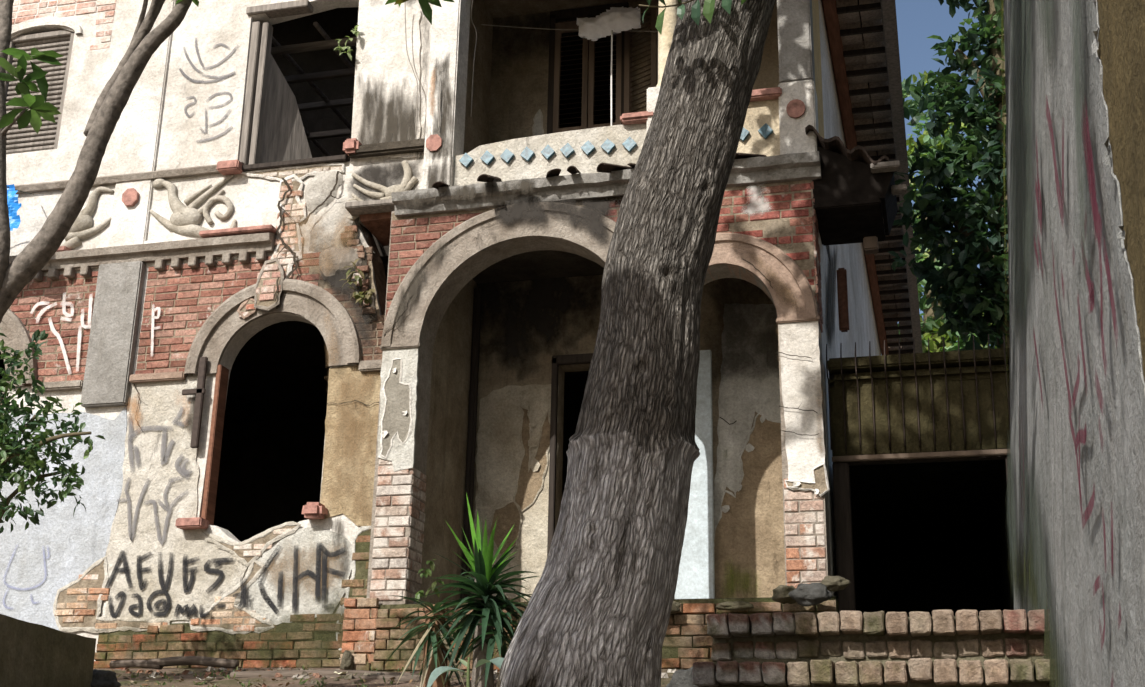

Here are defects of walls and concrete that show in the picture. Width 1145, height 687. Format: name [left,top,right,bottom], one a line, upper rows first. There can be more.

spalling [237,162,344,319]
leakage [351,57,624,241]
leakage [477,275,600,374]
spalling [189,521,302,634]
flaking render [319,357,412,659]
peeling [714,304,829,598]